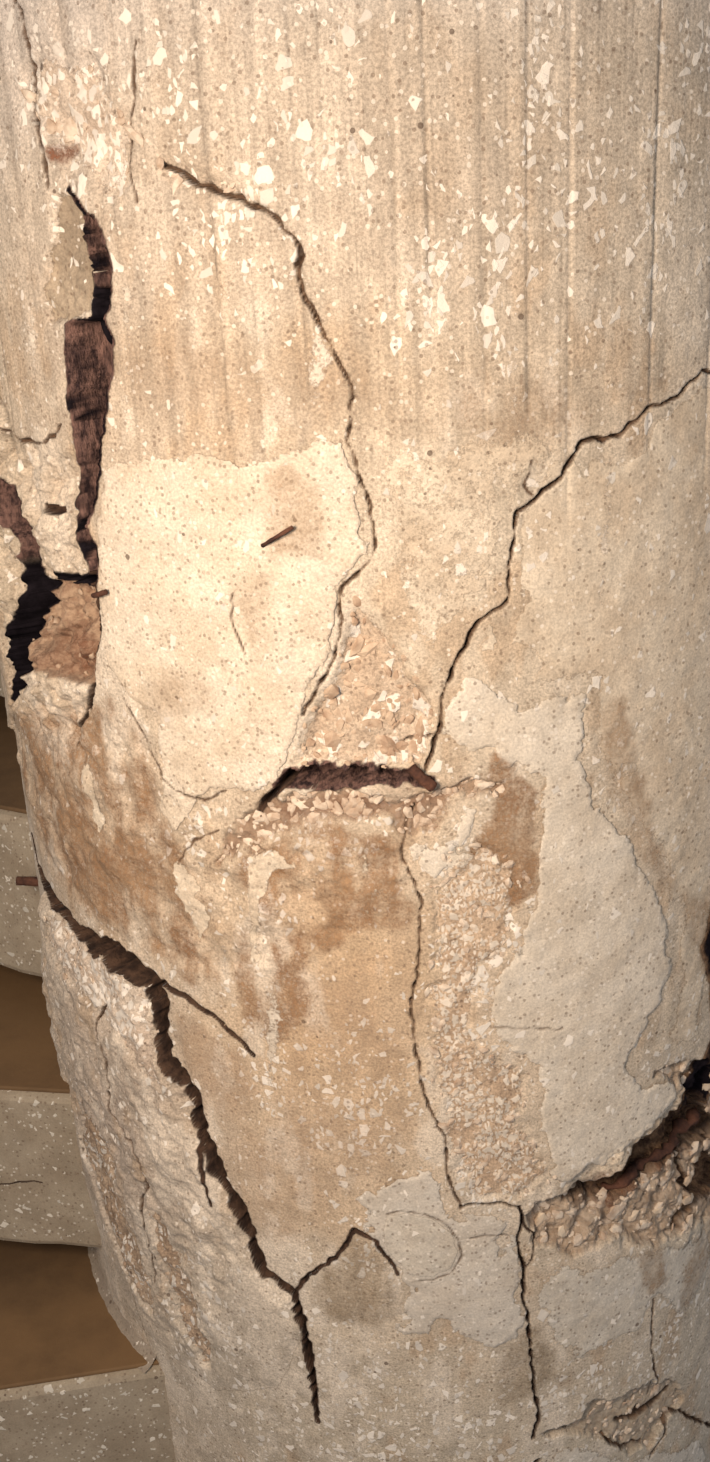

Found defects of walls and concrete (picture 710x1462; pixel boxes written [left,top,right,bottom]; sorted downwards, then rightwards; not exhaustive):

crack [14,0,49,185]
spalling [44,195,95,321]
crack [0,424,62,444]
crack [130,41,377,715]
crack [129,708,227,861]
peeling [25,387,710,1362]
crack [387,369,710,1462]
crack [96,1005,156,1271]
spalling [547,1379,706,1462]